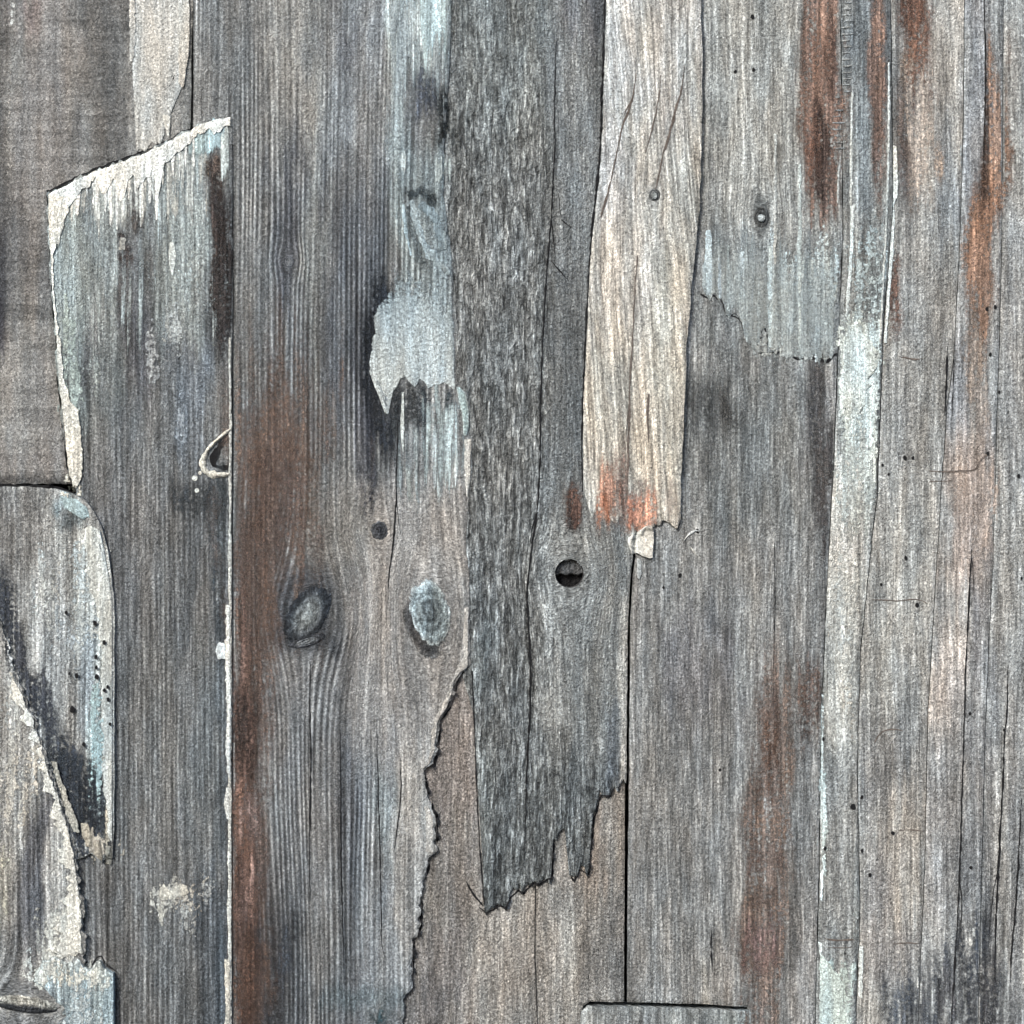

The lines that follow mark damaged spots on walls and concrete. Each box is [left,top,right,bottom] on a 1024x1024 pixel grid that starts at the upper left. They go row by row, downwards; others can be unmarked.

peeling [384,0,453,144]
peeling [434,155,451,183]
corrosion [797,0,847,227]
corrosion [963,41,1014,436]
peeling [369,193,471,504]
peeling [0,0,232,1024]
crack [376,0,685,1024]
corrosion [566,483,582,530]
corrosion [596,457,677,531]
peeling [628,526,654,579]
peeling [423,607,469,768]
peeling [424,806,434,852]